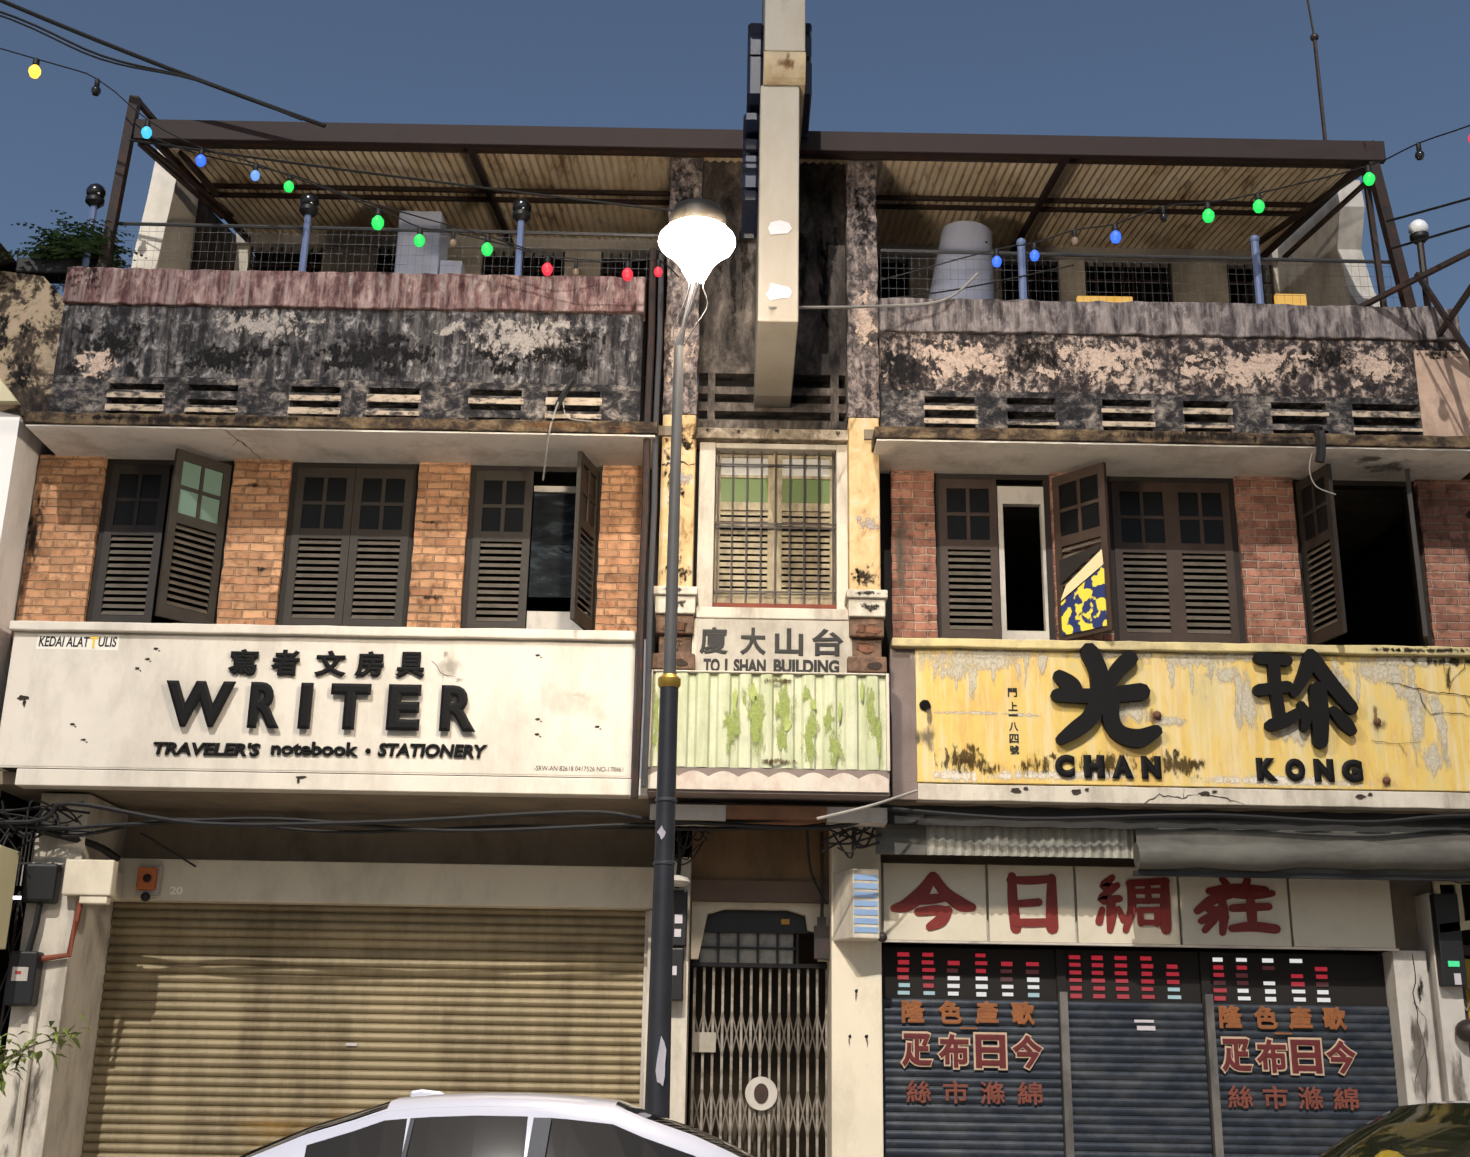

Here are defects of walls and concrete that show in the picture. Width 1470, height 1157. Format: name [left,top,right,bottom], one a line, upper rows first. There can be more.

damp [799,227,838,327]
damp [64,319,154,378]
damp [169,332,438,376]
damp [475,325,613,376]
damp [850,510,909,612]
peeling [723,679,844,767]
peeling [914,649,1048,717]
peeling [1100,651,1260,729]
peeling [1322,656,1451,776]
crack [1371,661,1470,755]
peeling [934,769,1134,794]
peeling [1200,775,1372,799]